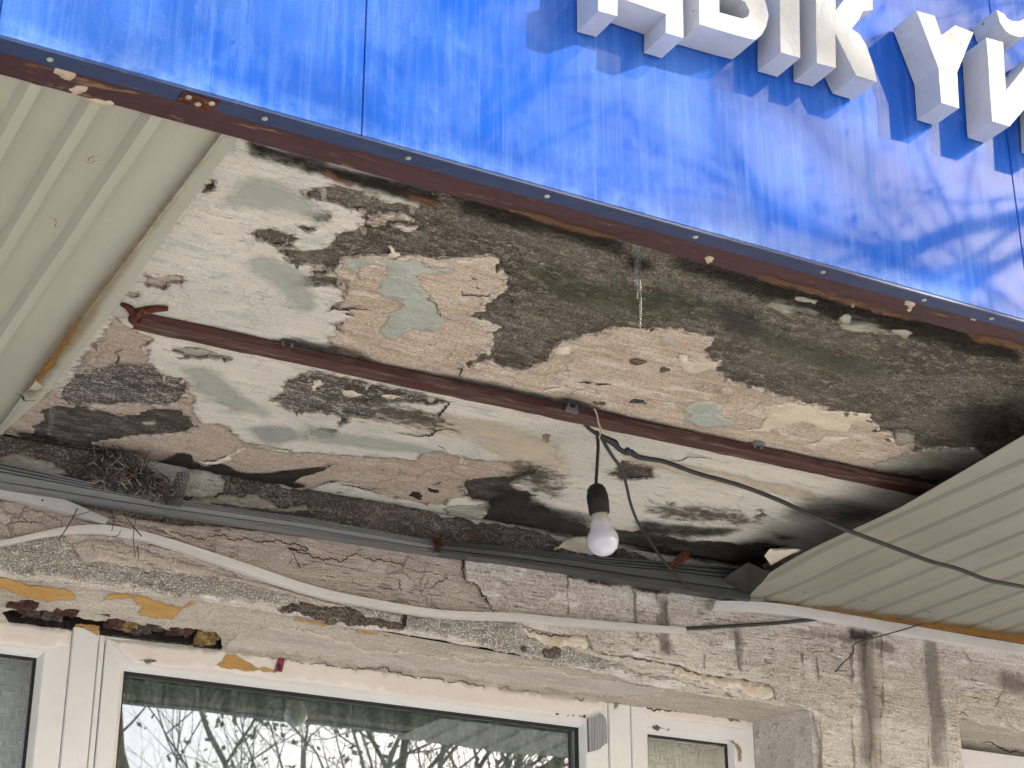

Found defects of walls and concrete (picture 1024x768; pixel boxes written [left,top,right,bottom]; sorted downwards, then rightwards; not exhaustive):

rust [508,209,619,239]
rust [27,276,117,394]
peeling [146,276,183,288]
water stain [273,338,376,364]
flaking render [255,187,1024,475]
rust [758,274,913,321]
peeling [0,317,780,569]
crack [123,521,493,629]
spalling [0,536,775,700]
water stain [486,492,591,537]
water stain [637,522,736,538]
water stain [850,639,885,763]